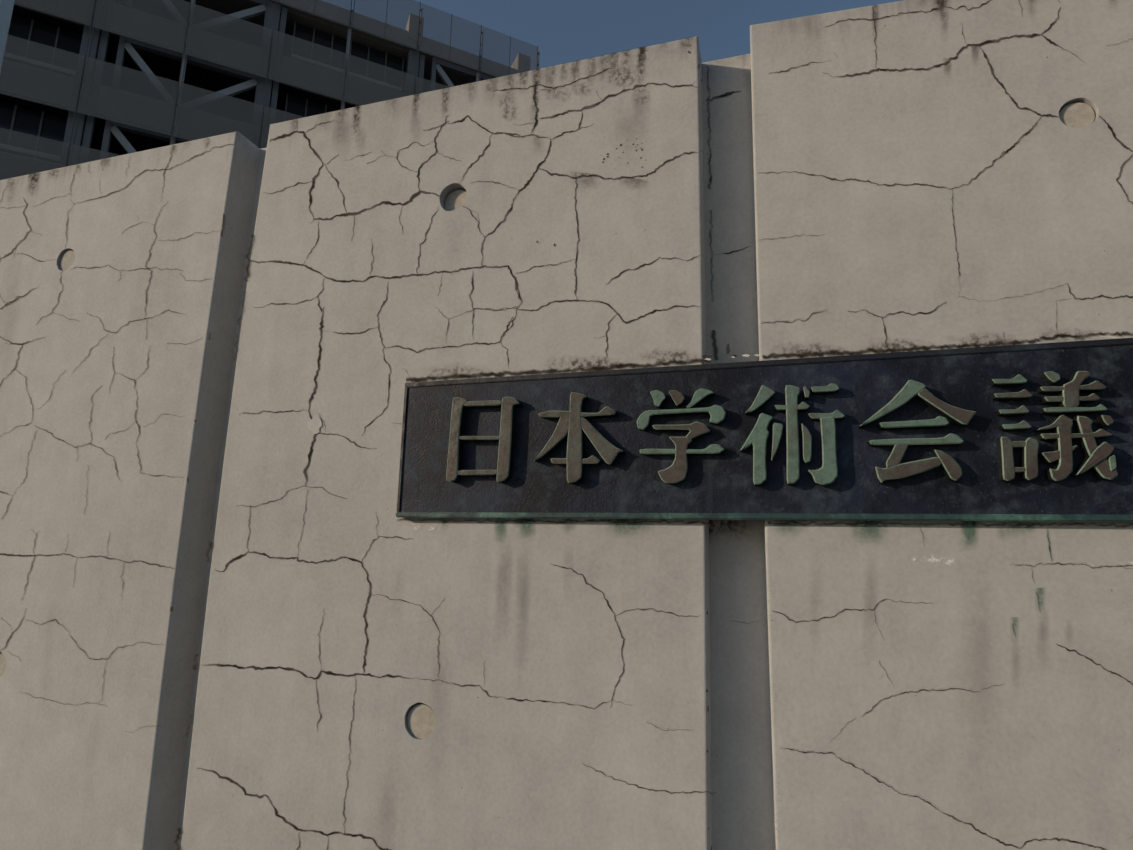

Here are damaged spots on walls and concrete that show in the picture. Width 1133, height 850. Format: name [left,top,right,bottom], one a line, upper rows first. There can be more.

crack [761,0,1085,348]
crack [1099,116,1133,204]
crack [0,144,234,518]
crack [999,285,1133,329]
crack [199,68,823,850]
crack [0,535,176,589]
crack [773,599,927,624]
damp [963,521,975,541]
crack [1017,530,1133,610]
crack [5,619,131,704]
crack [1057,644,1133,685]
crack [786,660,1106,850]